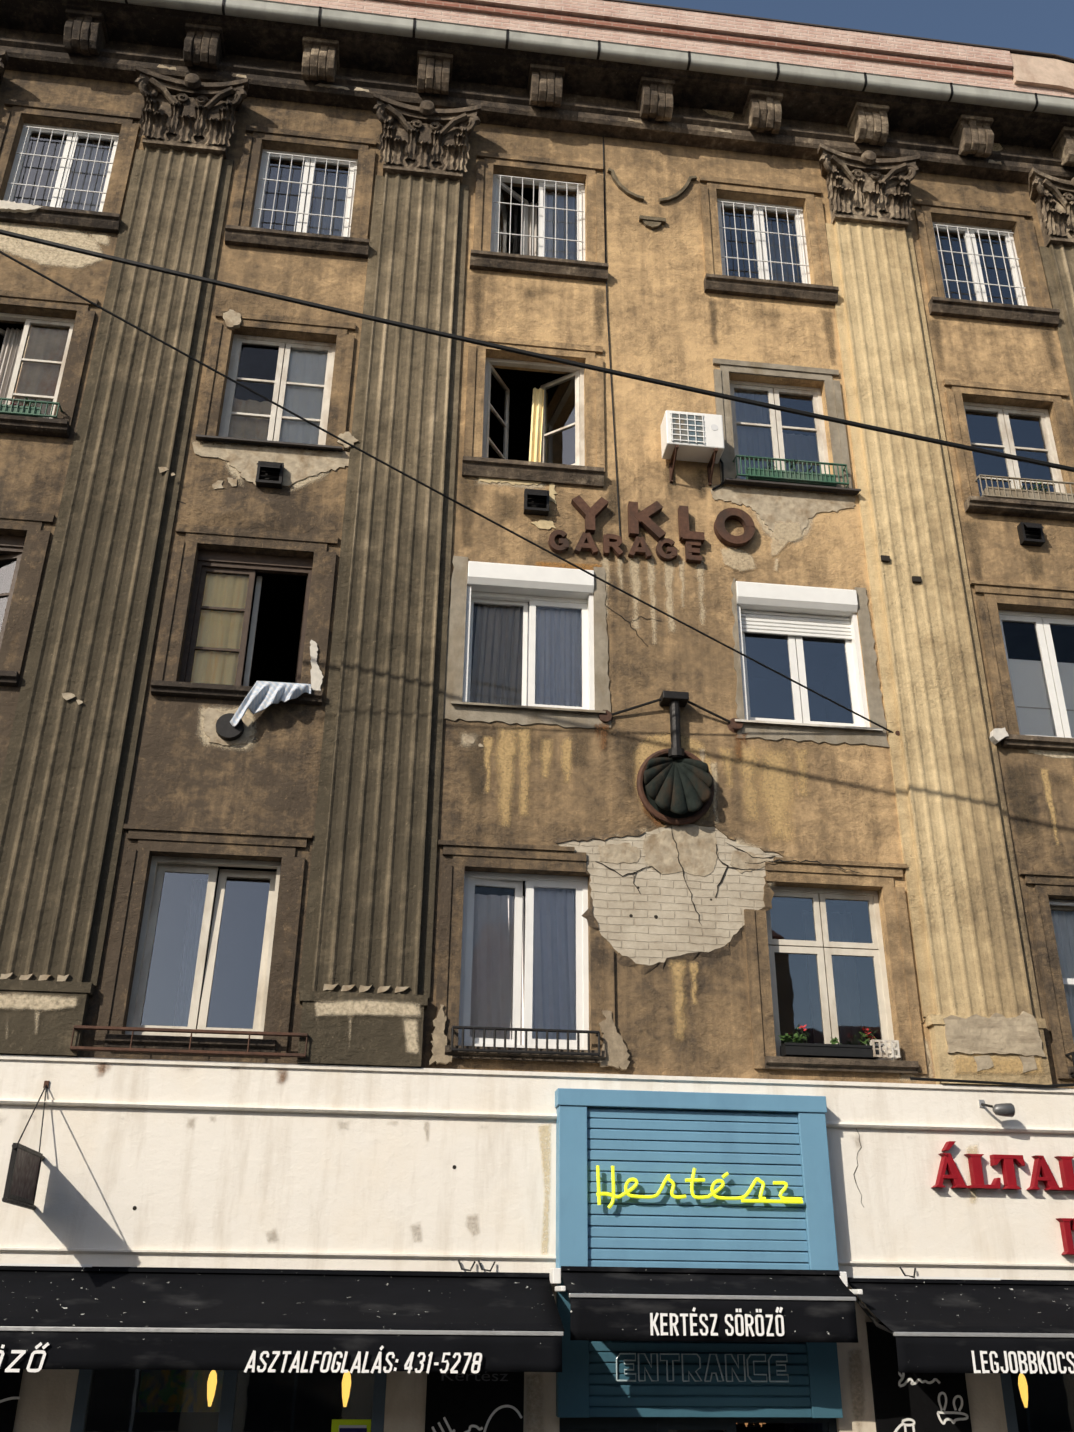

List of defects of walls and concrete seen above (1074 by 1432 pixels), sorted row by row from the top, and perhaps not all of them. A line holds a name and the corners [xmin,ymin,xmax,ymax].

peeling [0,200,108,268]
spalling [223,309,242,330]
spalling [192,432,359,490]
peeling [722,547,754,571]
peeling [771,522,802,571]
water stain [602,558,704,641]
water stain [635,734,806,838]
spalling [554,818,793,975]
crack [595,827,863,924]